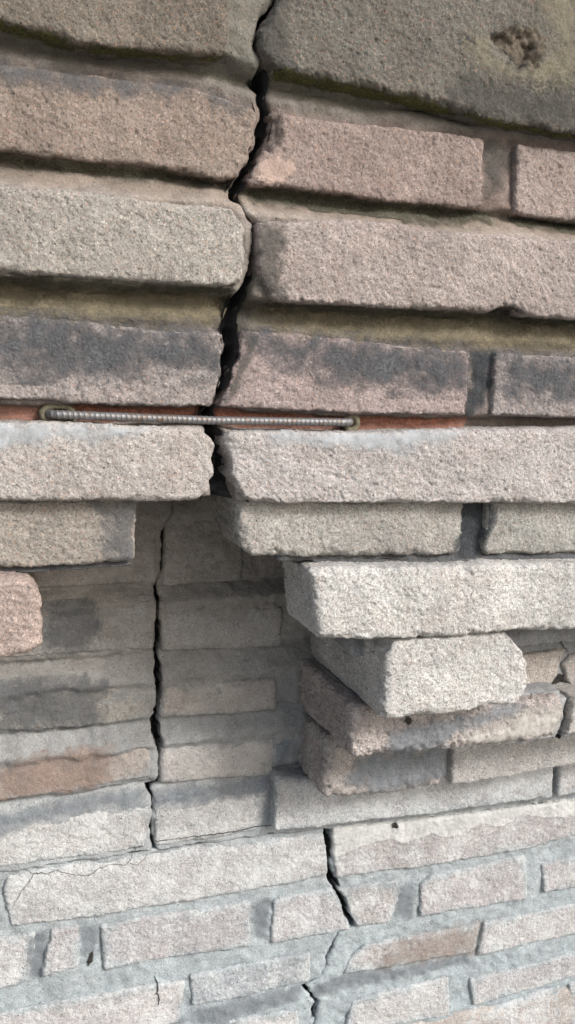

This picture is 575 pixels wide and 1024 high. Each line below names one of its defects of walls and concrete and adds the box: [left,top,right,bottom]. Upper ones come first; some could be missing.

crack [226,70,273,203]
corrosion [74,406,195,416]
crack [197,275,252,503]
corrosion [215,410,343,427]
corrosion [359,416,453,427]
crack [150,584,160,738]
crack [323,828,353,924]